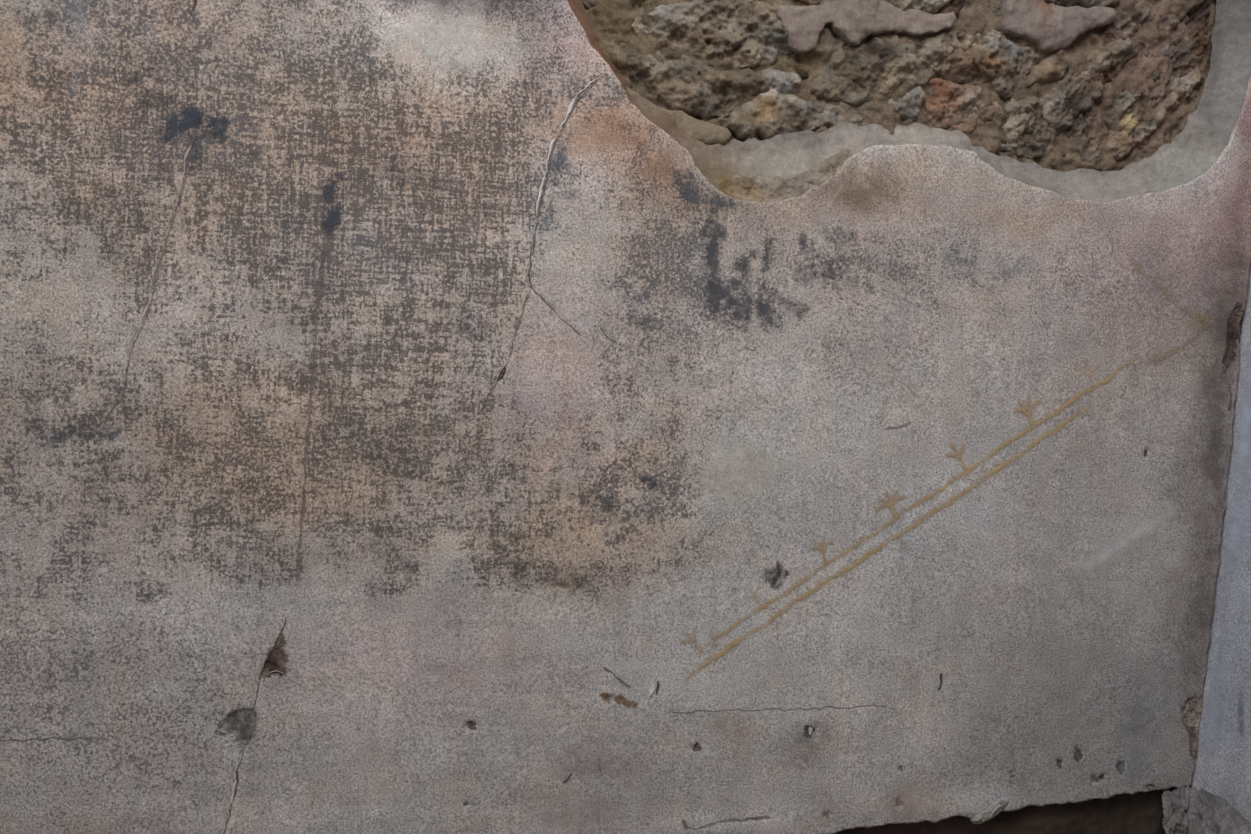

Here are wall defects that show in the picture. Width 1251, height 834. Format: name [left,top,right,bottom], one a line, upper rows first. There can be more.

flaking render [568,0,1251,202]
crack [104,138,198,423]
crack [478,78,616,414]
crack [224,617,286,833]